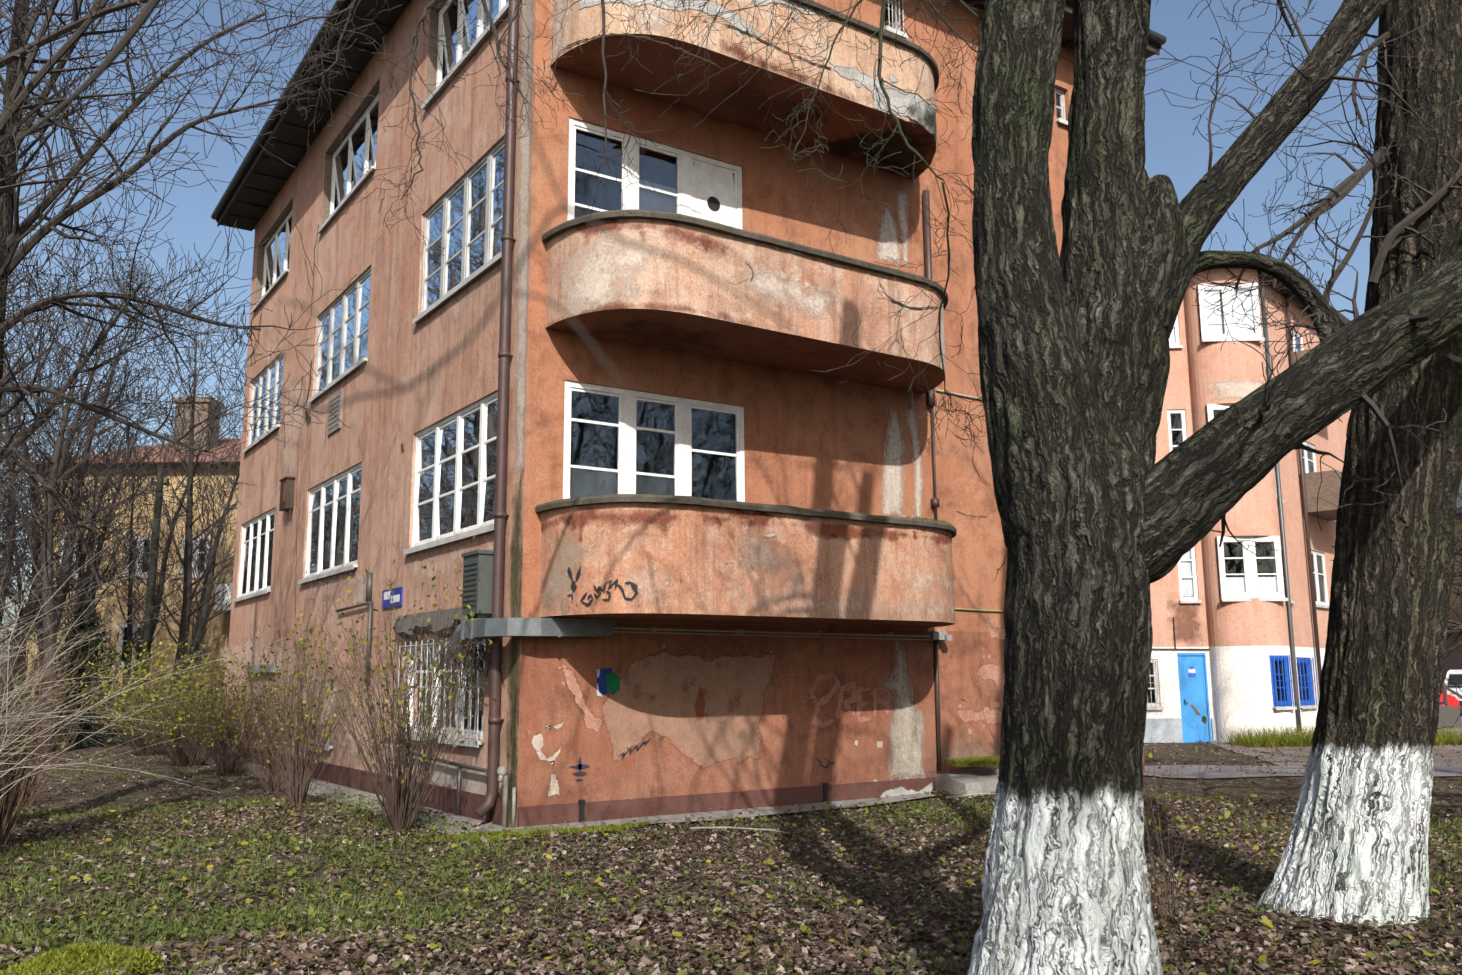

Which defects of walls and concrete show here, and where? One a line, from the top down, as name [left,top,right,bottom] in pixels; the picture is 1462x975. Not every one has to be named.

peeling [579,0,827,37]
spalling [833,65,937,138]
peeling [557,642,776,768]
peeling [531,721,565,797]